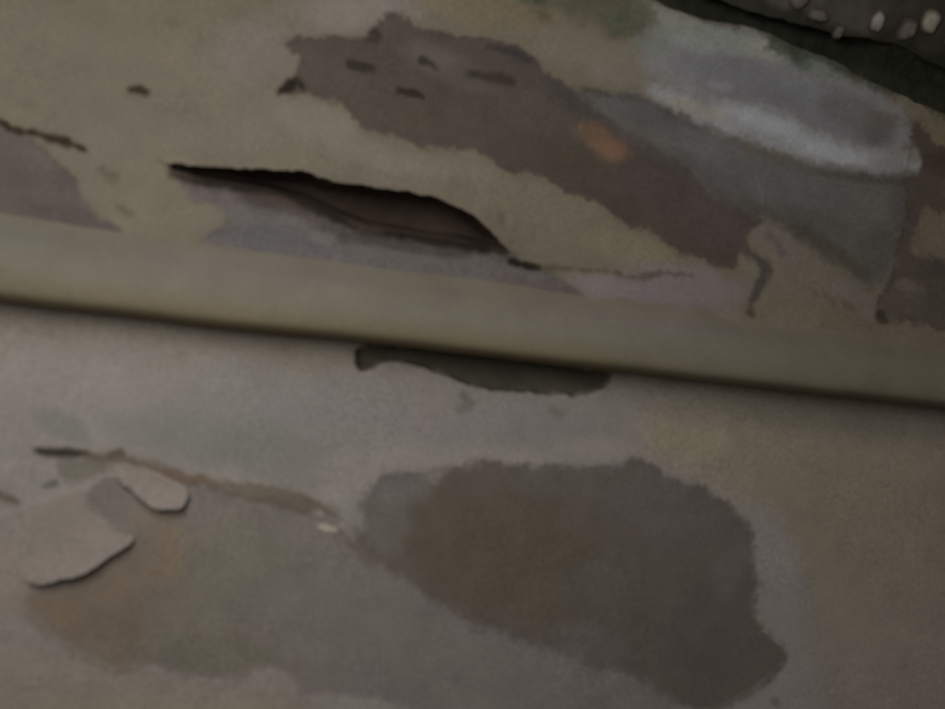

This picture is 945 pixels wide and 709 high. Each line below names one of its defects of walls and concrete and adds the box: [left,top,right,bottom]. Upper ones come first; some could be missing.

peeling [0,129,139,234]
spalling [156,7,761,299]
damp [570,0,945,297]
spalling [872,117,945,335]
peeling [0,317,857,709]
damp [351,450,792,709]